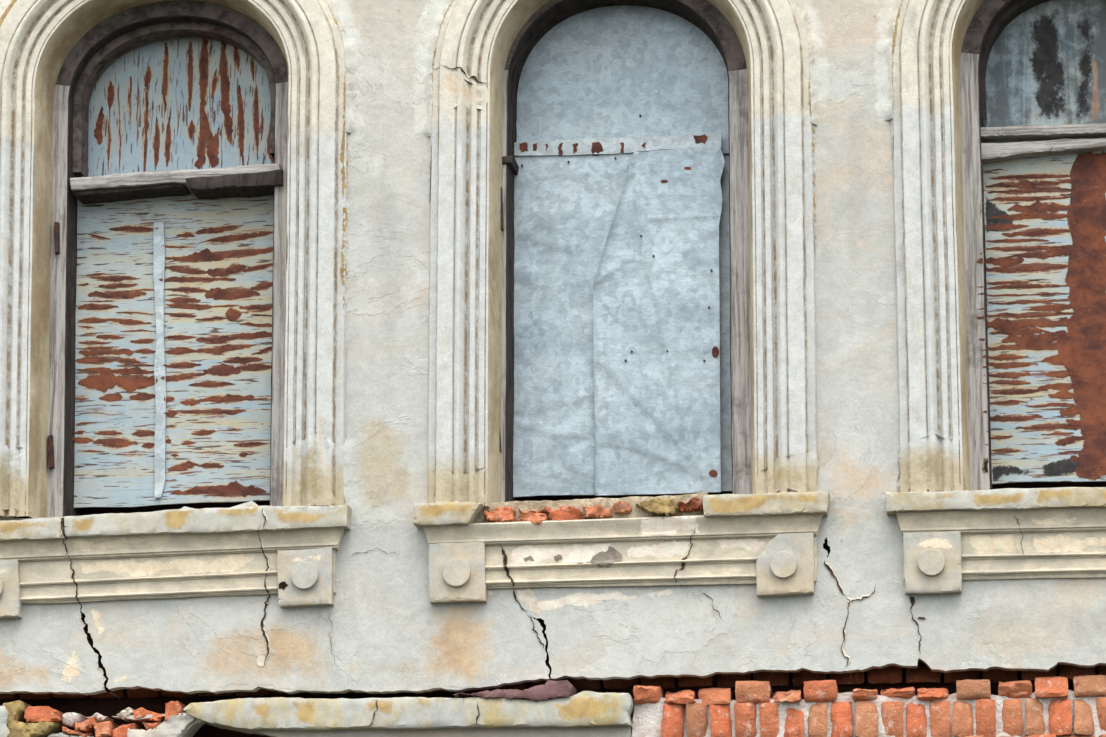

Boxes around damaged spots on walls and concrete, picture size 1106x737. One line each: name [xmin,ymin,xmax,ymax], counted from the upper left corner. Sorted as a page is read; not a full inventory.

corrosion [94,26,274,172]
corrosion [70,225,273,472]
corrosion [976,151,1106,480]
crack [59,518,120,699]
corrosion [171,481,267,497]
crack [258,508,271,665]
crack [499,544,552,678]
peeling [517,587,674,615]
peeling [509,497,703,568]
peeling [716,539,764,552]
crack [823,537,876,667]
spalling [2,700,203,737]